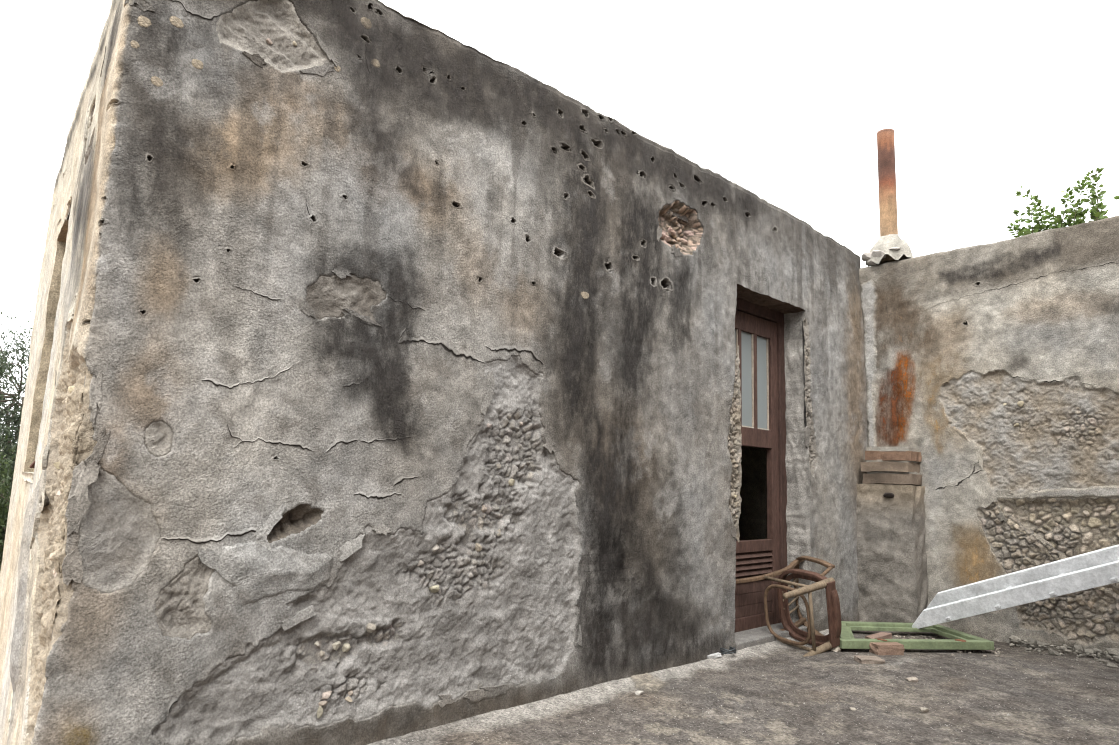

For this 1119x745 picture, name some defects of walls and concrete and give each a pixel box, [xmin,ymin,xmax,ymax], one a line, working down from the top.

spalling [216,0,337,76]
crack [388,296,543,365]
water stain [317,0,757,677]
crack [202,367,291,389]
rust [877,352,946,444]
spalling [25,306,160,745]
crack [161,527,259,545]
crack [227,424,411,452]
spalling [153,355,582,745]
crack [354,476,419,501]
spalling [940,370,1119,574]
spalling [1016,582,1119,646]